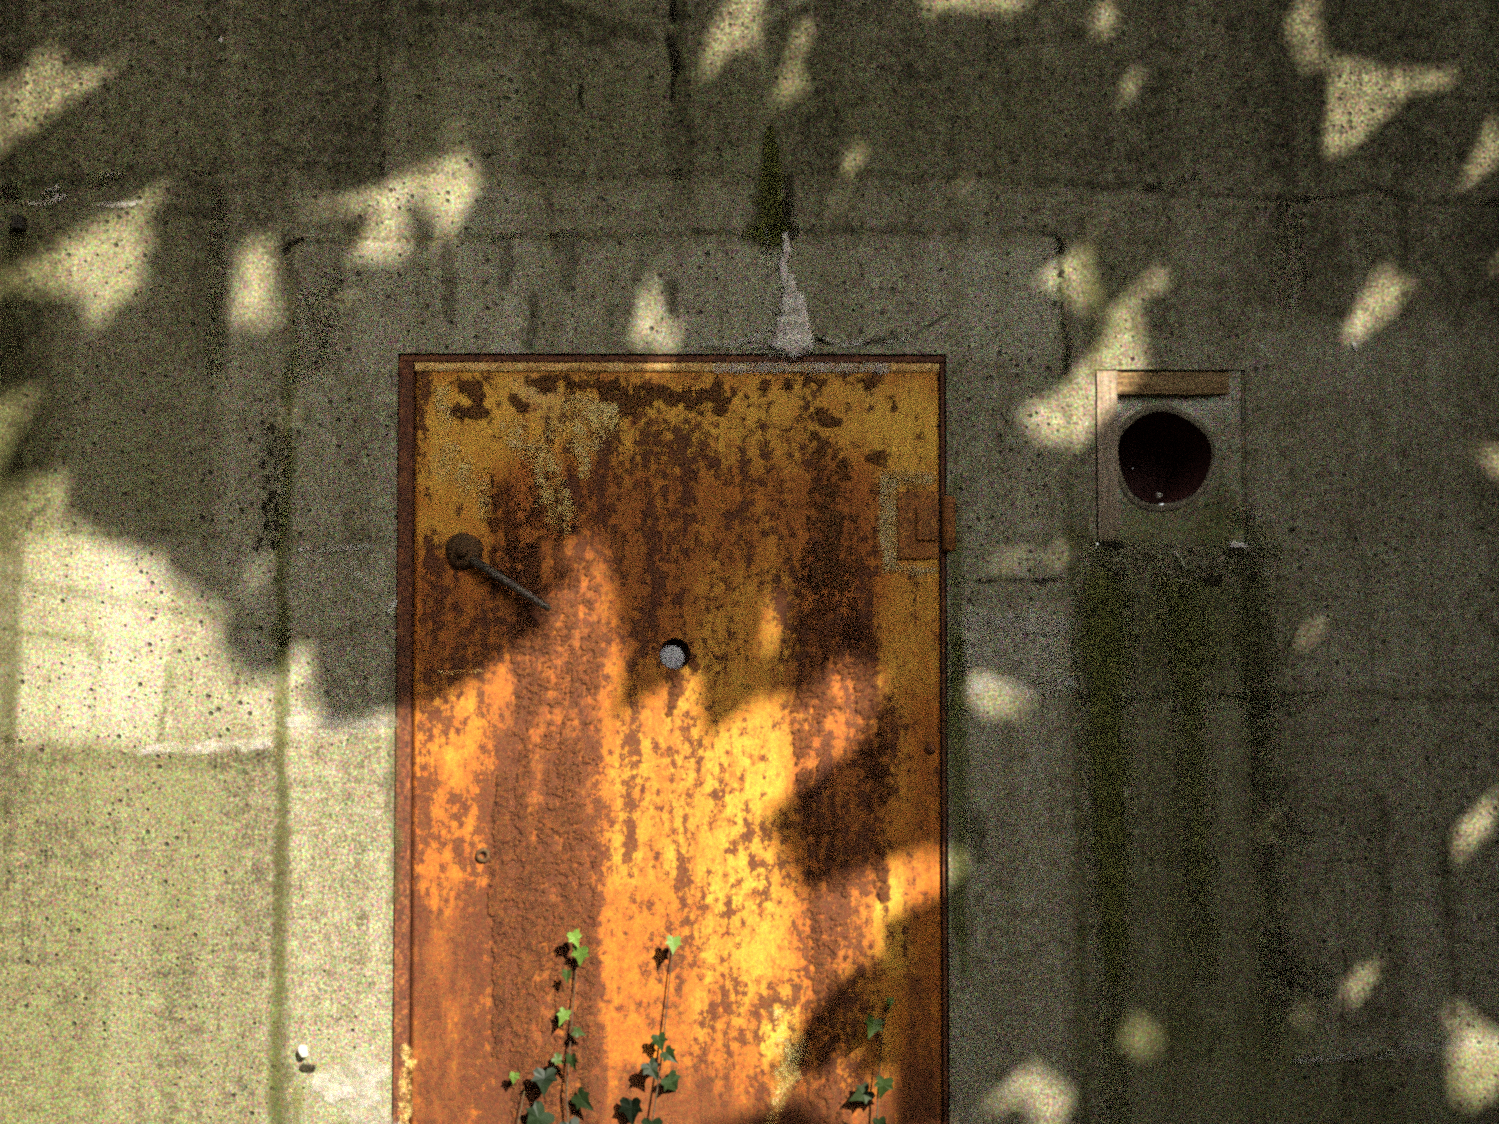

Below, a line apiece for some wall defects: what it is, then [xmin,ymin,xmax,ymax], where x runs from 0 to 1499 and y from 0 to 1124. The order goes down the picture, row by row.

leakage [715,170,889,373]
leakage [0,230,28,741]
rust [449,372,738,423]
rust [757,372,828,391]
rust [857,368,898,412]
rust [482,470,603,1124]
rust [665,652,701,716]
rust [790,407,894,1124]
leakage [1052,550,1128,984]
leakage [1166,575,1215,979]
rust [400,1045,416,1121]